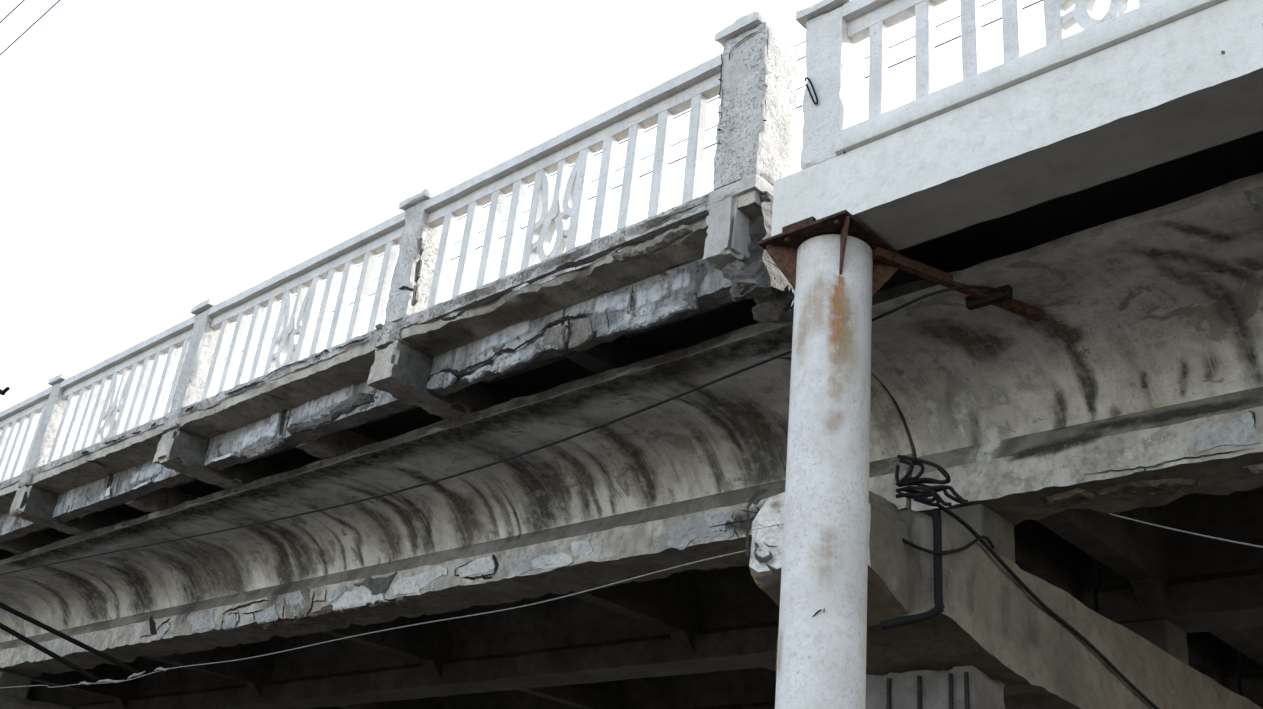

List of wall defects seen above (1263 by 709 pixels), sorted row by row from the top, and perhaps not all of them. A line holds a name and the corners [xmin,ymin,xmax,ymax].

spalling [411,226,424,308]
spalling [722,191,795,322]
crack [427,284,633,379]
rust [813,276,852,353]
damp [1024,315,1096,411]
damp [1148,250,1263,383]
damp [1013,365,1249,459]
damp [12,321,792,626]
spalling [255,540,593,632]
peeling [666,489,767,550]
crack [708,506,784,539]
spalling [754,542,782,572]